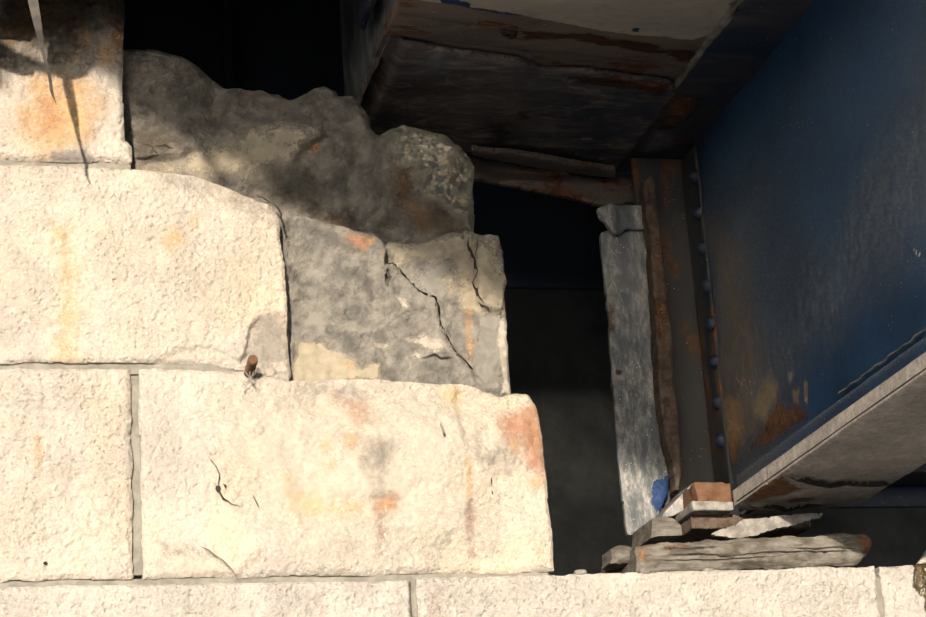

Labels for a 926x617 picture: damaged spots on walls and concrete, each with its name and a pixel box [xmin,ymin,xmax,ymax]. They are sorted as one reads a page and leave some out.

peeling [439,0,529,18]
rust [24,78,90,149]
crack [466,232,489,310]
crack [386,251,473,370]
rust [639,176,682,494]
rust [500,409,543,476]
rust [729,383,807,466]
crack [208,456,259,508]
rust [748,477,814,503]